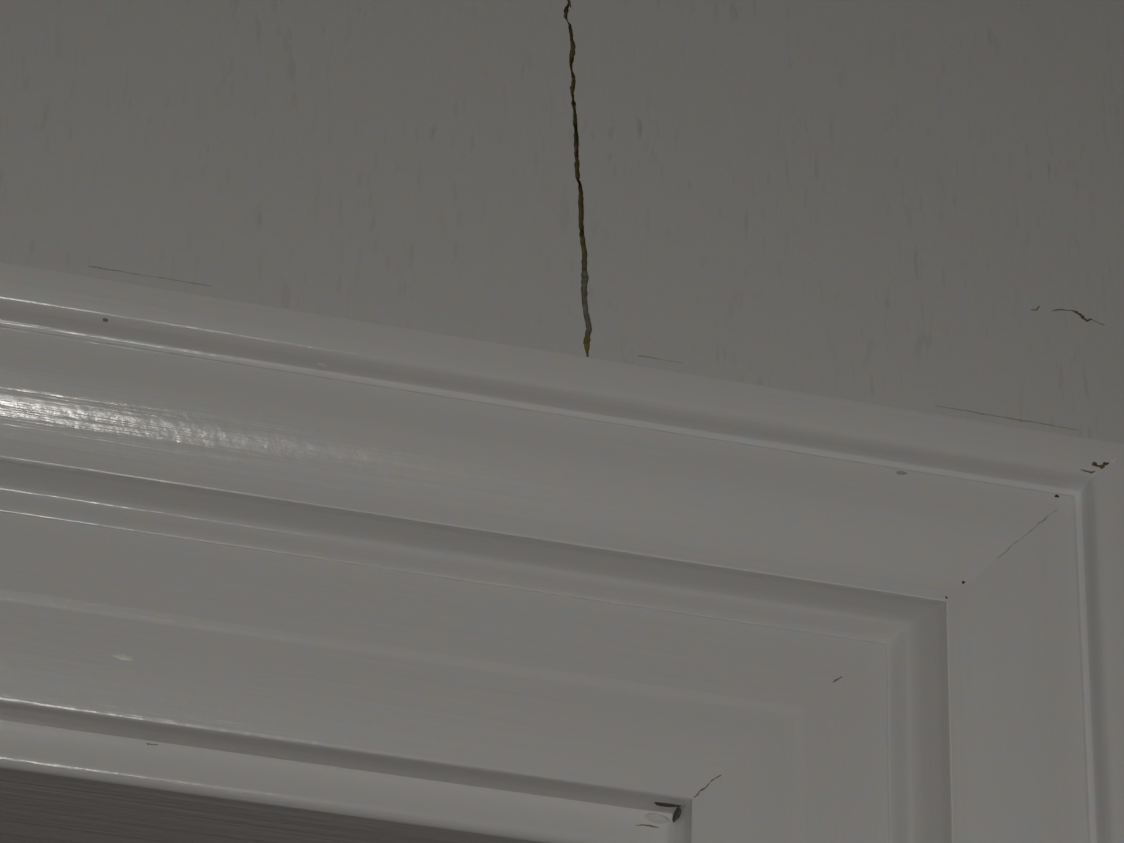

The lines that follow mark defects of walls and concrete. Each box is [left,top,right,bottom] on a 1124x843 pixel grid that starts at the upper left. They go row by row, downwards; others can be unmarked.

crack [564,0,592,357]
crack [1031,305,1104,325]